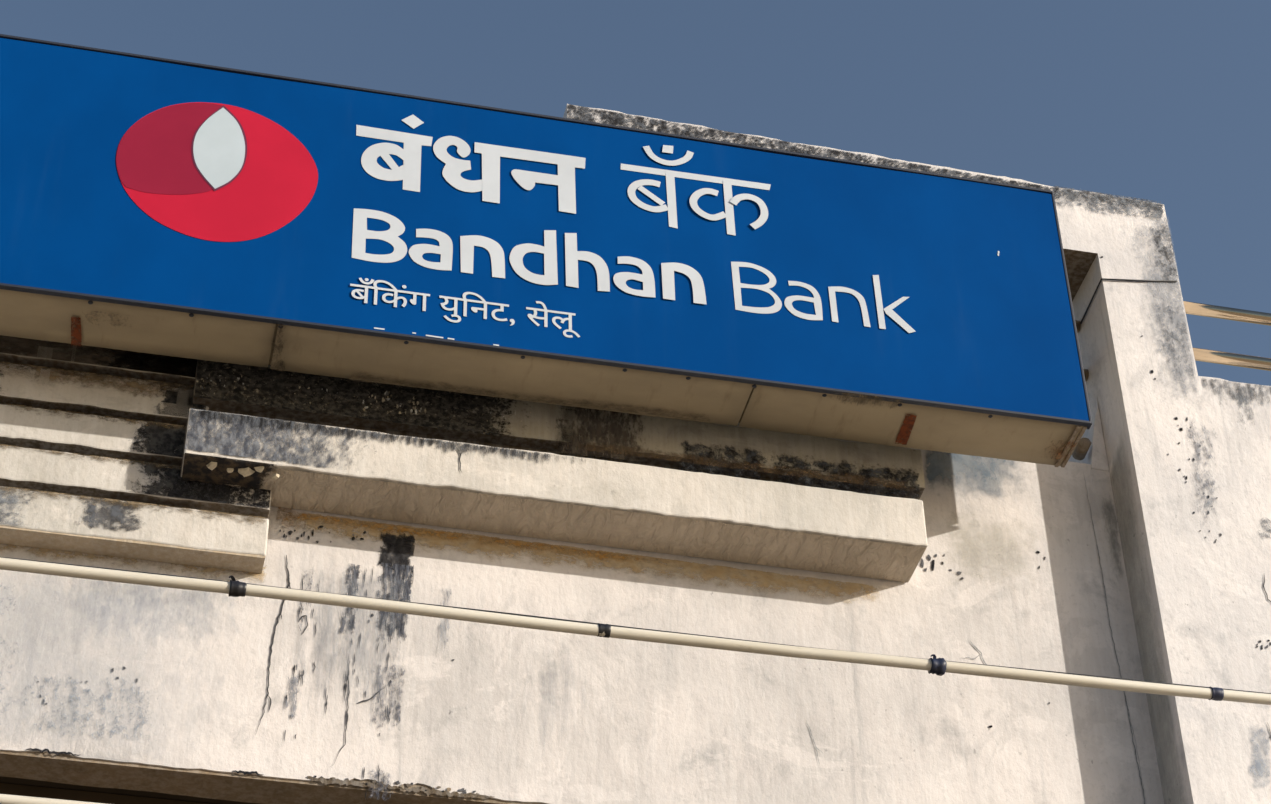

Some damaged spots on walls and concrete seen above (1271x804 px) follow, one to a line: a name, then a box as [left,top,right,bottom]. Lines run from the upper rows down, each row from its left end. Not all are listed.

leakage [0,486,28,526]
flaking render [206,462,280,493]
leakage [84,348,1013,531]
corrosion [278,507,877,596]
crack [257,555,308,730]
leakage [340,533,415,736]
leakage [284,662,315,740]
leakage [363,765,391,801]